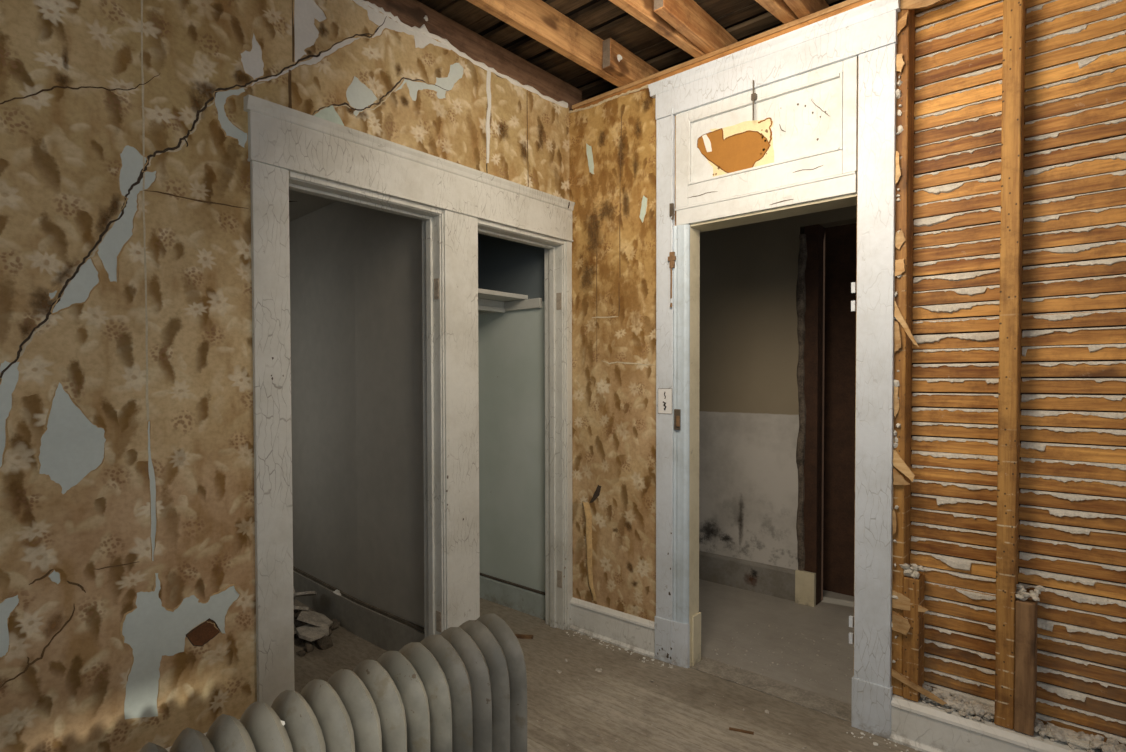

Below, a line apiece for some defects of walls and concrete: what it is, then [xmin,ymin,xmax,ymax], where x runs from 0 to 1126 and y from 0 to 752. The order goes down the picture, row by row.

peeling [213,0,464,147]
crack [313,77,450,114]
peeling [48,145,157,315]
crack [0,16,387,381]
peeling [0,361,20,468]
peeling [37,382,106,495]
flaking render [911,0,1003,707]
flaking render [1019,0,1126,744]
peeling [0,595,19,659]
crack [0,562,137,688]
peeling [120,420,241,719]
water stain [699,503,743,542]